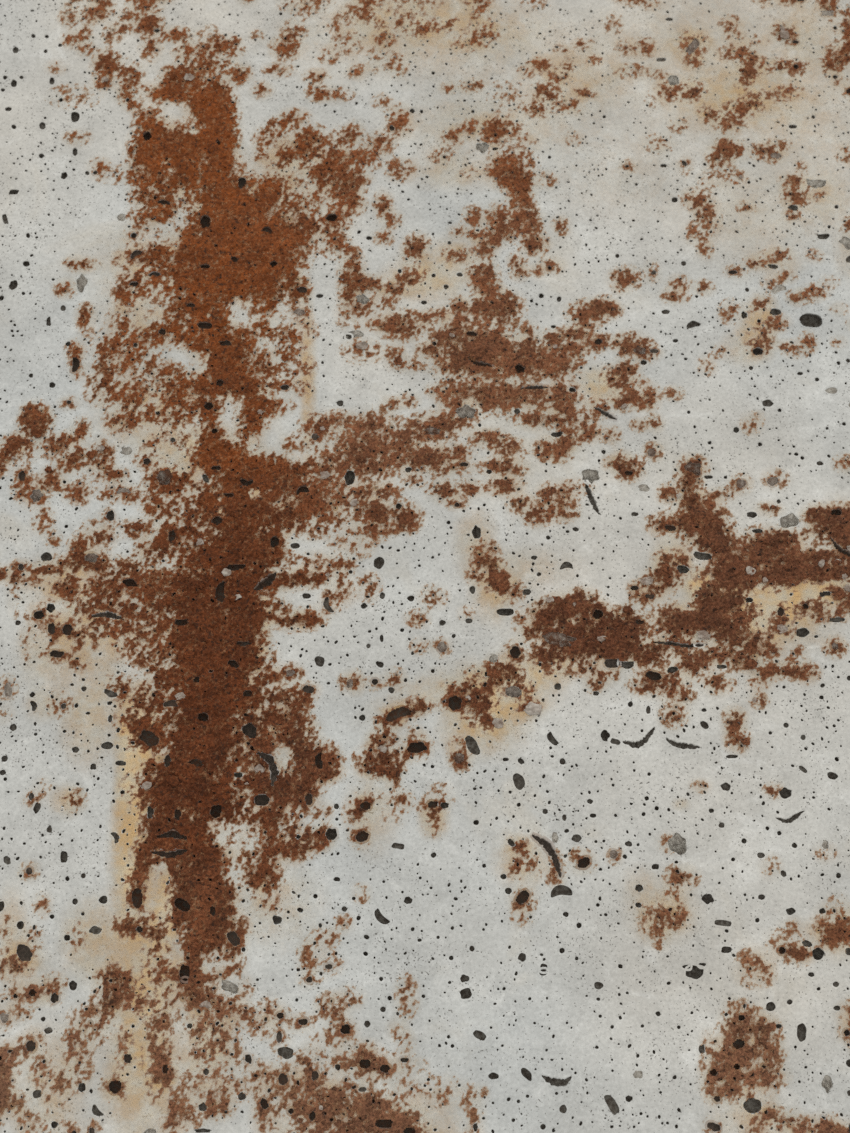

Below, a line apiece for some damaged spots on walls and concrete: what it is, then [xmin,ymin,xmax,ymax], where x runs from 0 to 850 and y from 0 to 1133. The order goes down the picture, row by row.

corrosion [250,0,336,100]
corrosion [303,0,501,103]
corrosion [493,44,581,119]
corrosion [600,0,850,259]
corrosion [718,247,848,359]
corrosion [603,441,664,484]
corrosion [351,453,850,838]
corrosion [0,896,68,1032]
corrosion [296,913,353,984]
corrosion [504,836,622,927]
corrosion [636,834,702,951]
corrosion [698,894,850,1133]